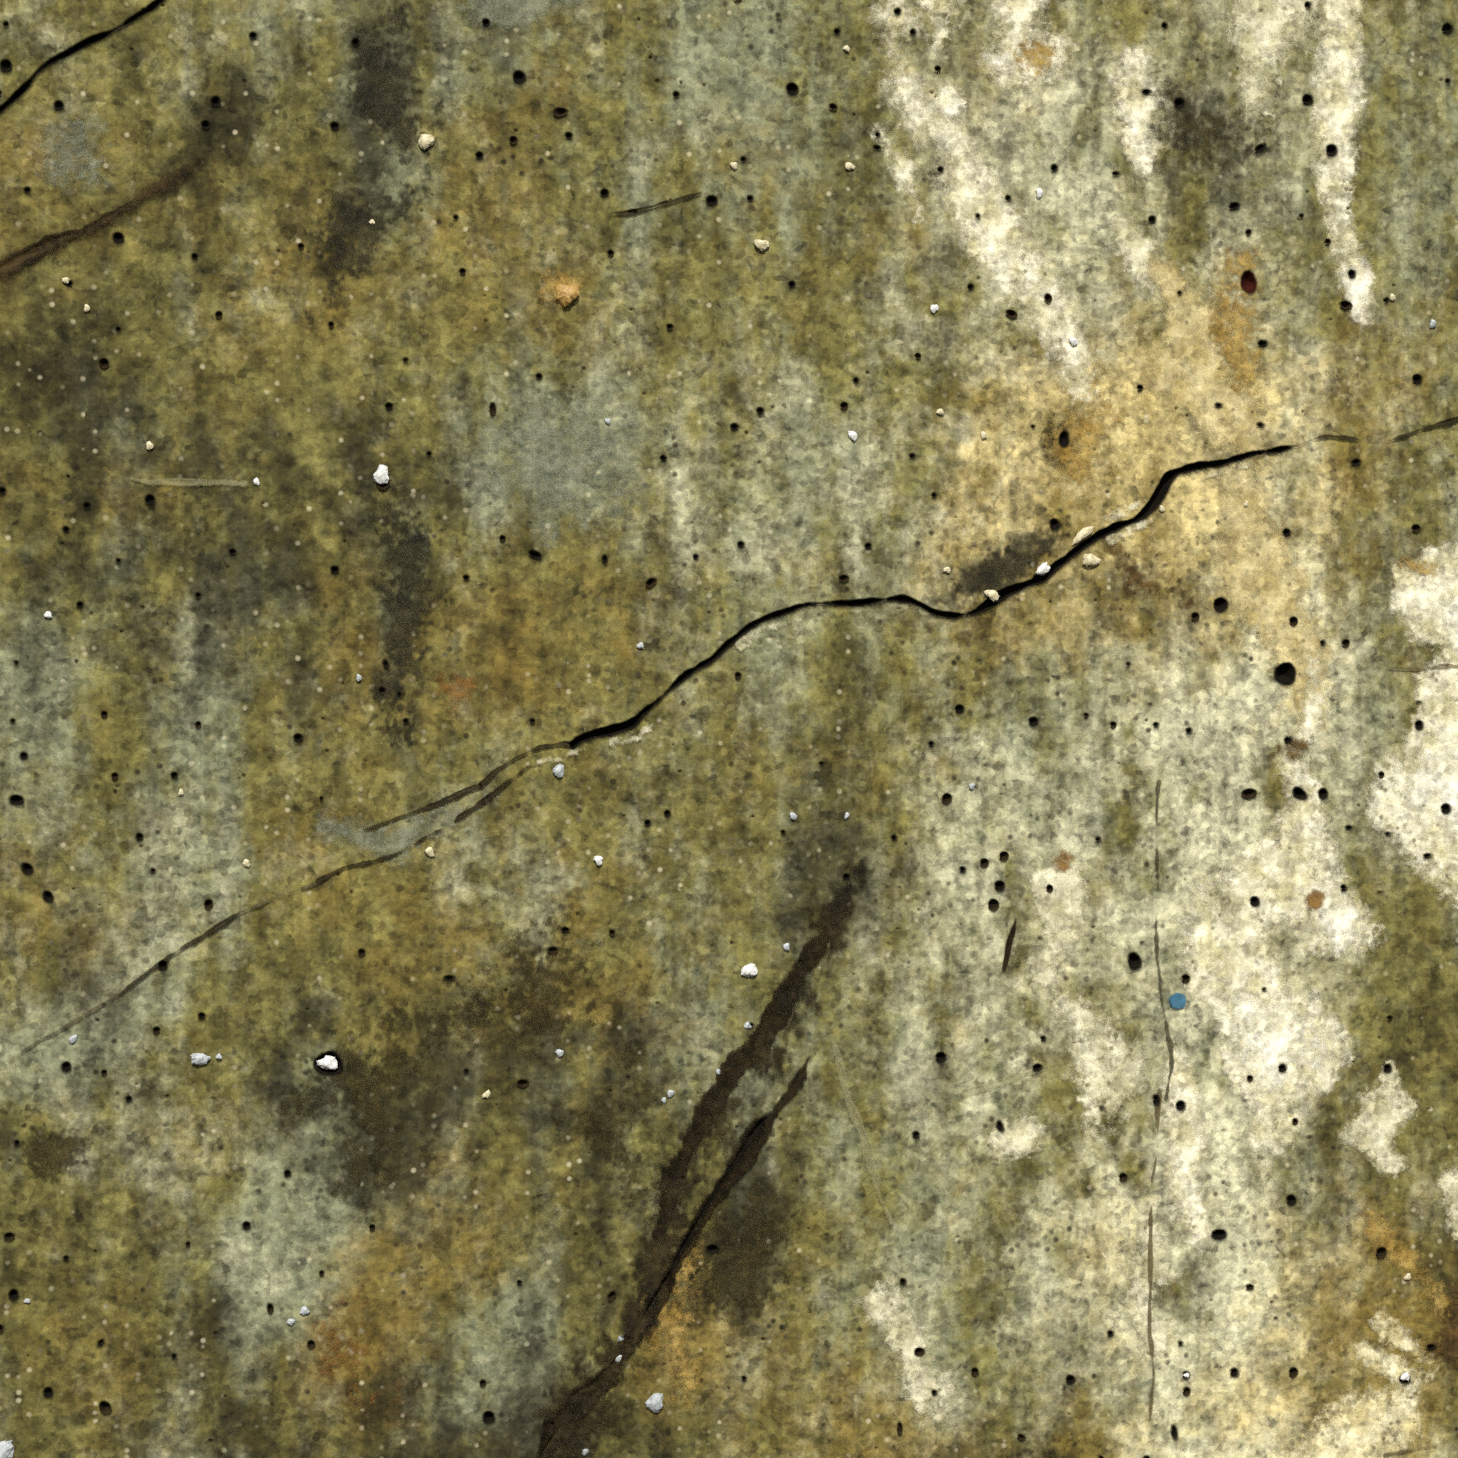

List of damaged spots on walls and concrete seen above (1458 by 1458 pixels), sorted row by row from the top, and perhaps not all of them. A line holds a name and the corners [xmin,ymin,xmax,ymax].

crack [0,0,164,113]
crack [0,159,200,279]
leakage [868,0,964,55]
leakage [871,73,1103,402]
leakage [981,0,1080,91]
leakage [1109,43,1164,175]
leakage [1228,0,1375,325]
crack [19,416,1458,1055]
crack [526,860,869,1458]
crack [1148,780,1174,1420]